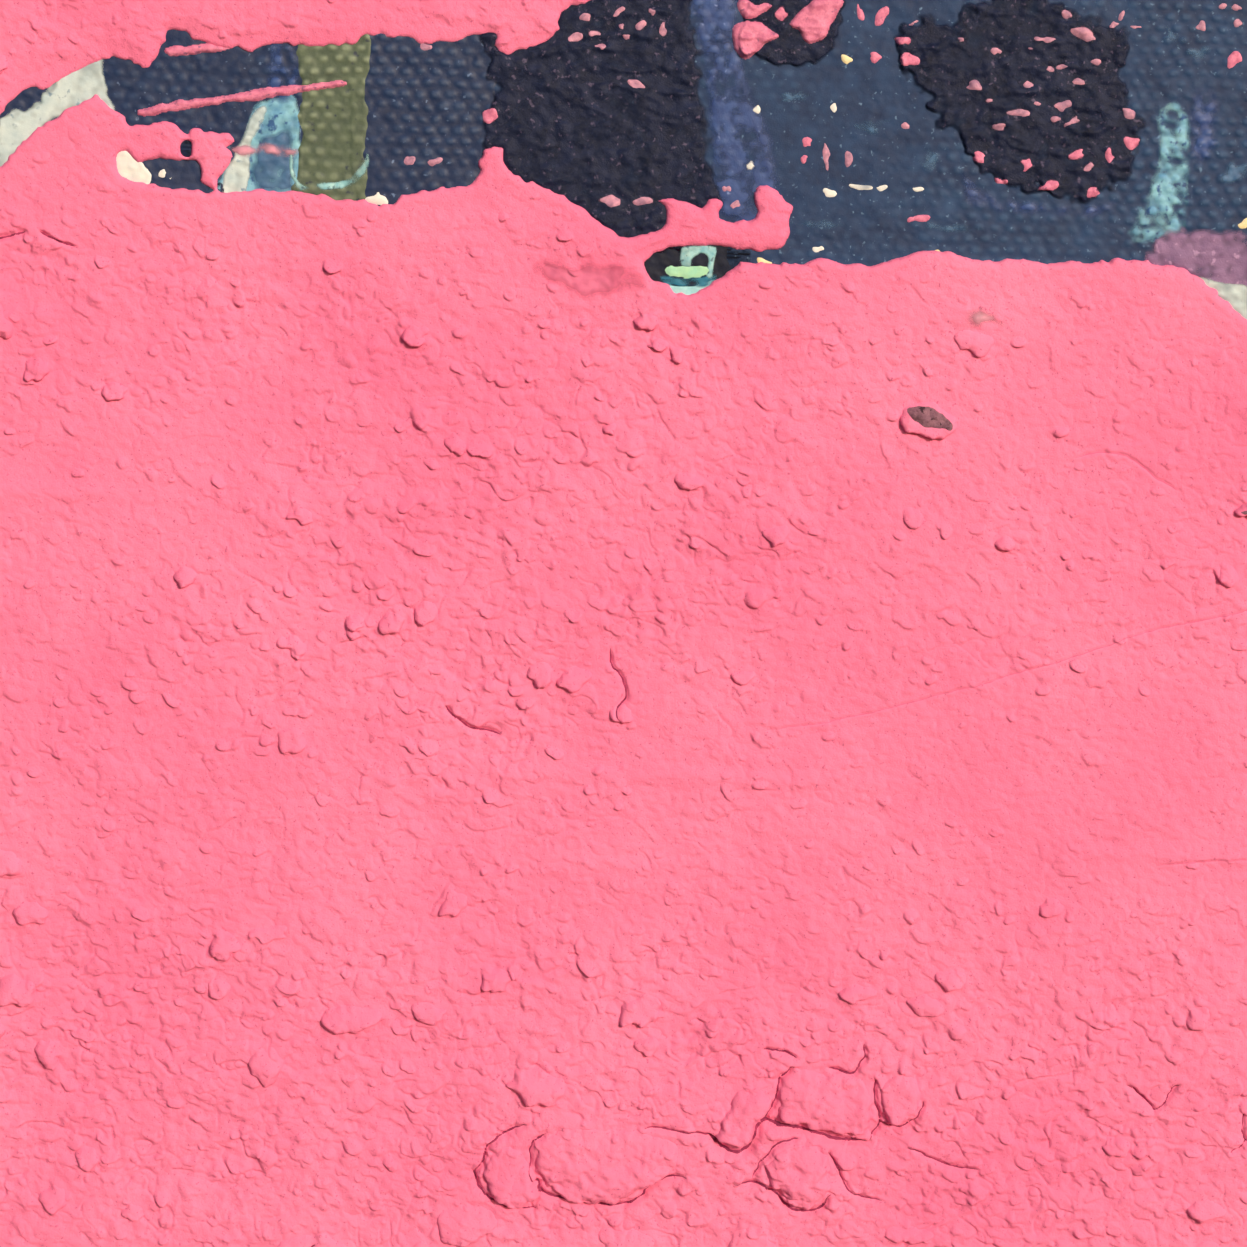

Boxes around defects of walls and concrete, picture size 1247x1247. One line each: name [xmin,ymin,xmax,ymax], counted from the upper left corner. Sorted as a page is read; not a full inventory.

peeling [0,0,1247,320]
crack [473,1124,685,1208]
crack [645,1045,978,1212]